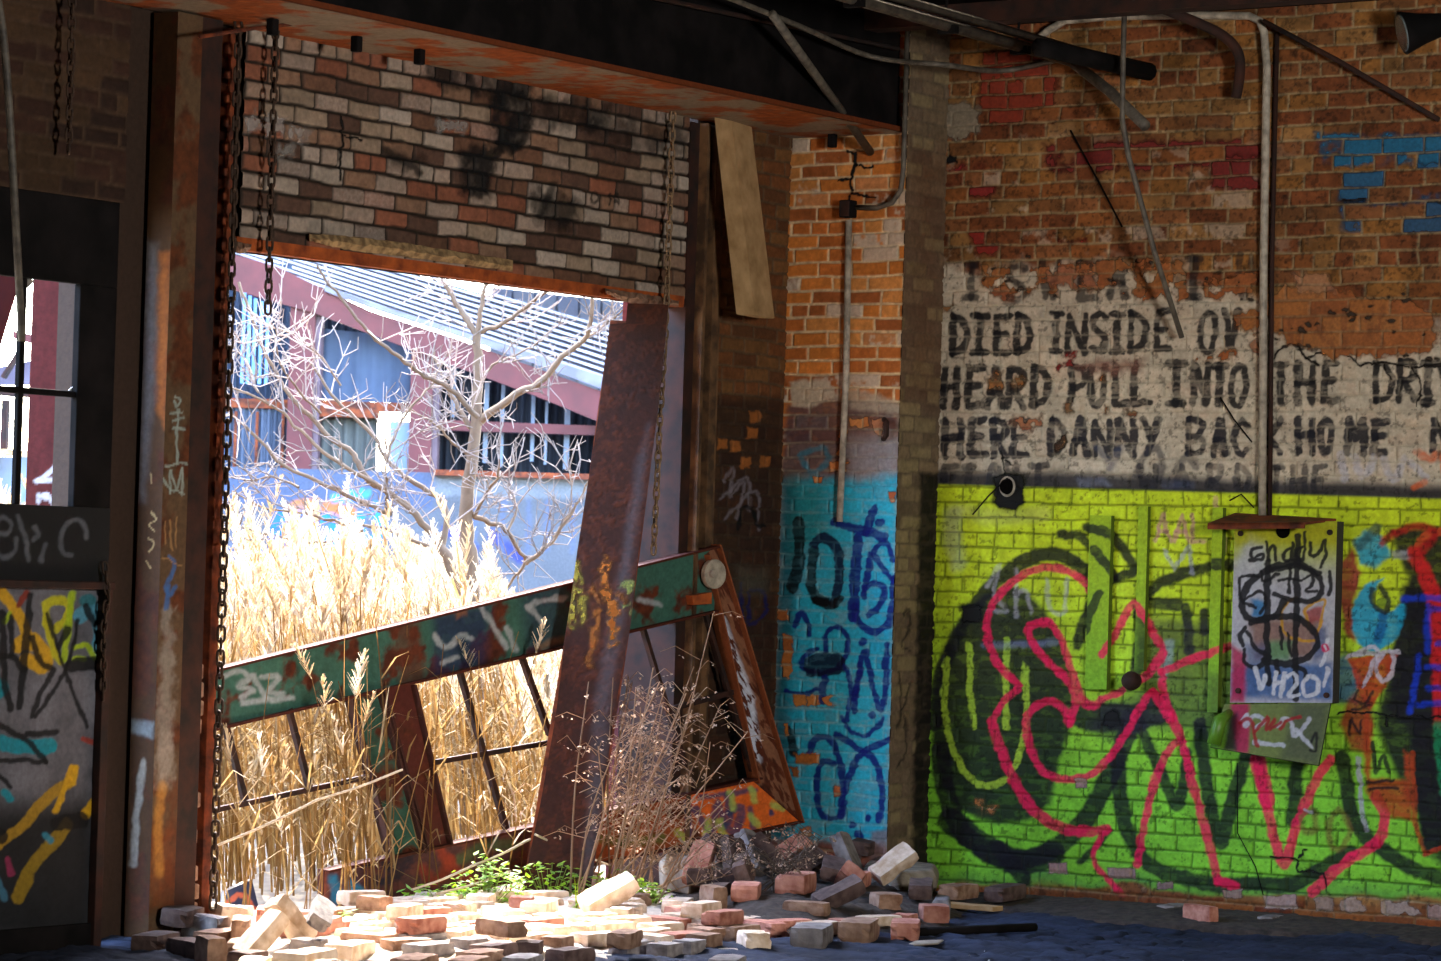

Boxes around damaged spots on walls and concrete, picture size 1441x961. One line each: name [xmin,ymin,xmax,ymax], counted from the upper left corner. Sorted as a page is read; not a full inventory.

peeling [968,232,1440,361]